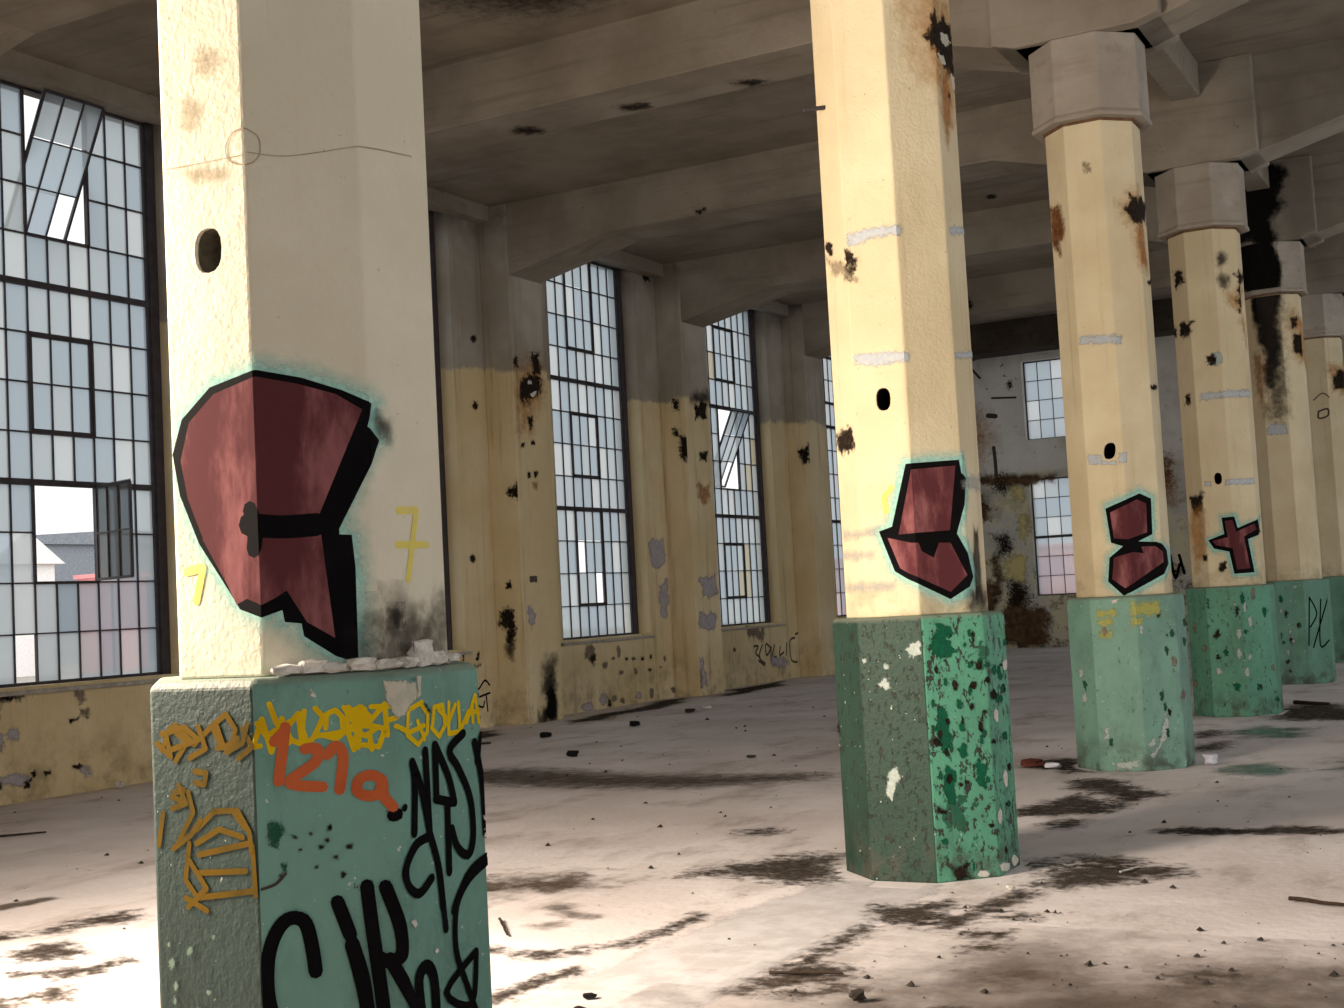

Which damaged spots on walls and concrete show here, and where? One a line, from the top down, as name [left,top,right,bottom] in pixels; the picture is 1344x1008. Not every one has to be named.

corrosion [923,0,955,143]
corrosion [1050,205,1064,255]
corrosion [1123,193,1147,264]
corrosion [1231,269,1244,327]
water stain [1257,295,1285,418]
corrosion [513,351,542,448]
water stain [542,658,556,693]
peeling [906,471,1051,828]
peeling [1164,585,1302,702]
peeling [1116,692,1172,771]
peeling [886,767,901,801]
peeling [952,846,1019,881]